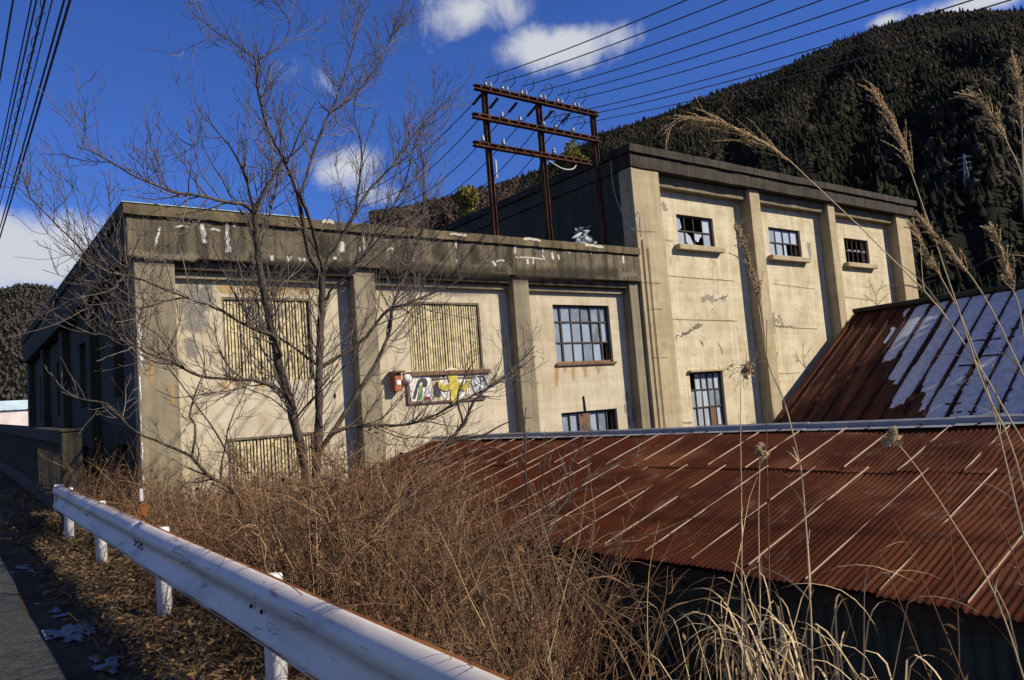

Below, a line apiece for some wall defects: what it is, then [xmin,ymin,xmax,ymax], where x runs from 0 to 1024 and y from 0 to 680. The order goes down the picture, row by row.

crack [676,294,733,373]
crack [773,312,814,376]